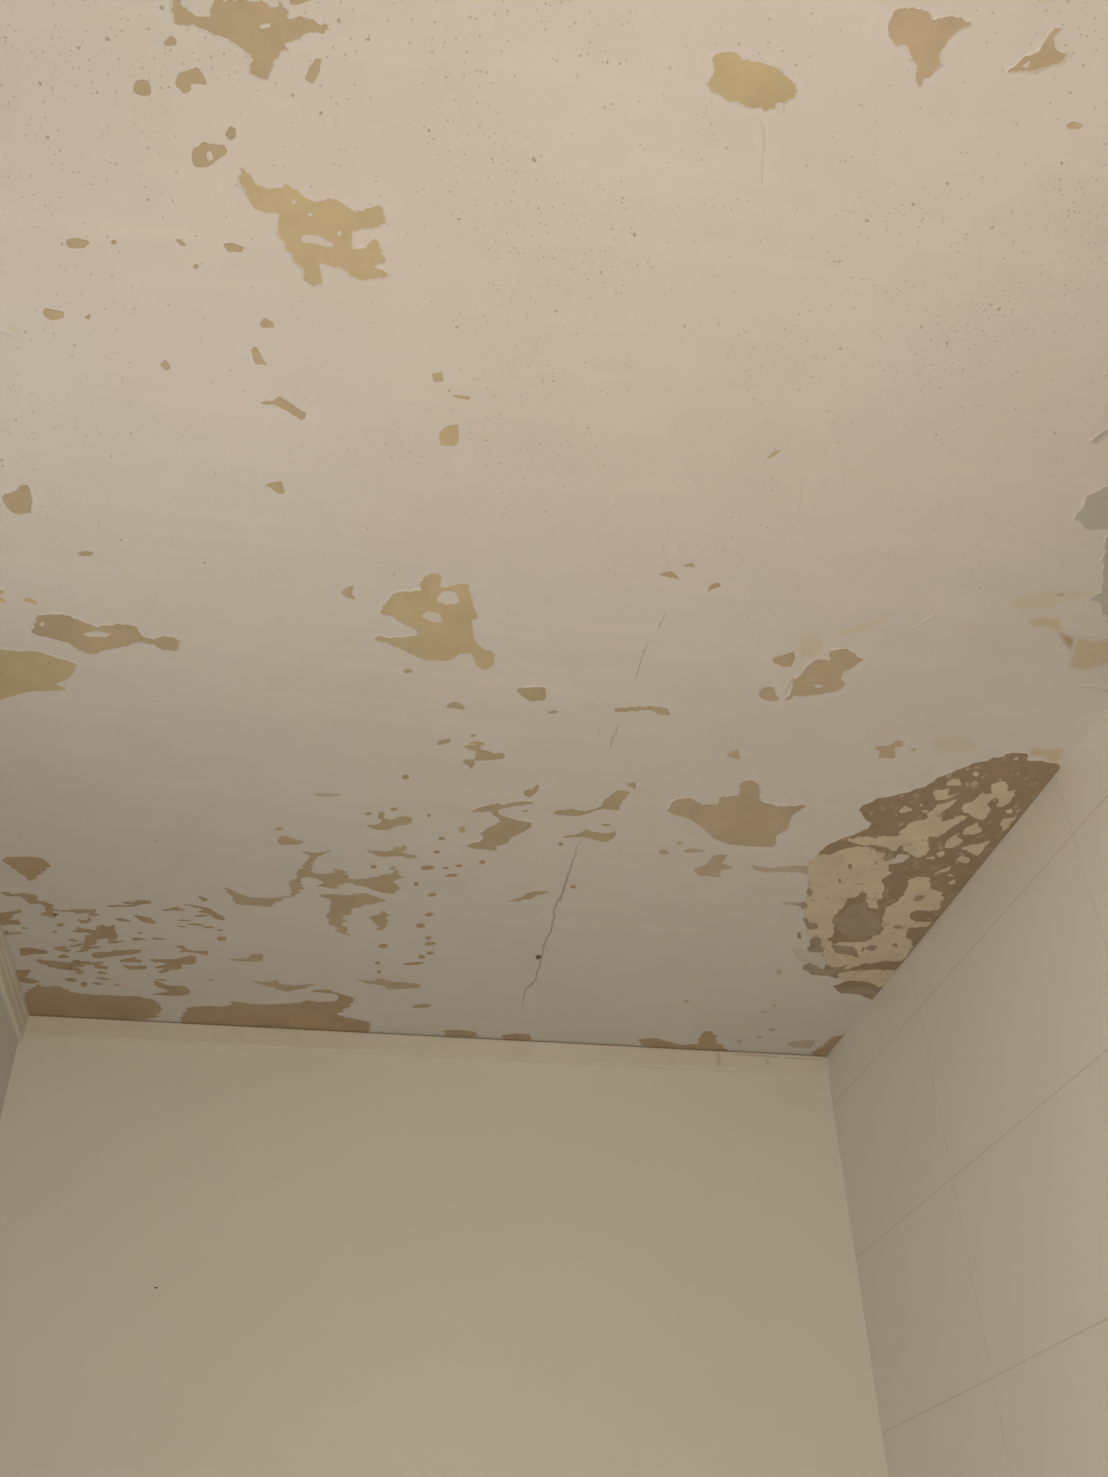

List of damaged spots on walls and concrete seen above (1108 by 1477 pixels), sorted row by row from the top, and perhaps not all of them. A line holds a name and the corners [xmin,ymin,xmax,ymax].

peeling [164,0,330,84]
peeling [704,50,798,112]
peeling [884,5,972,87]
peeling [191,126,236,168]
peeling [236,165,391,288]
peeling [0,588,182,701]
peeling [373,571,497,673]
peeling [759,647,865,702]
peeling [553,783,636,846]
peeling [658,779,809,877]
peeling [0,785,539,1033]
crack [522,842,581,1004]